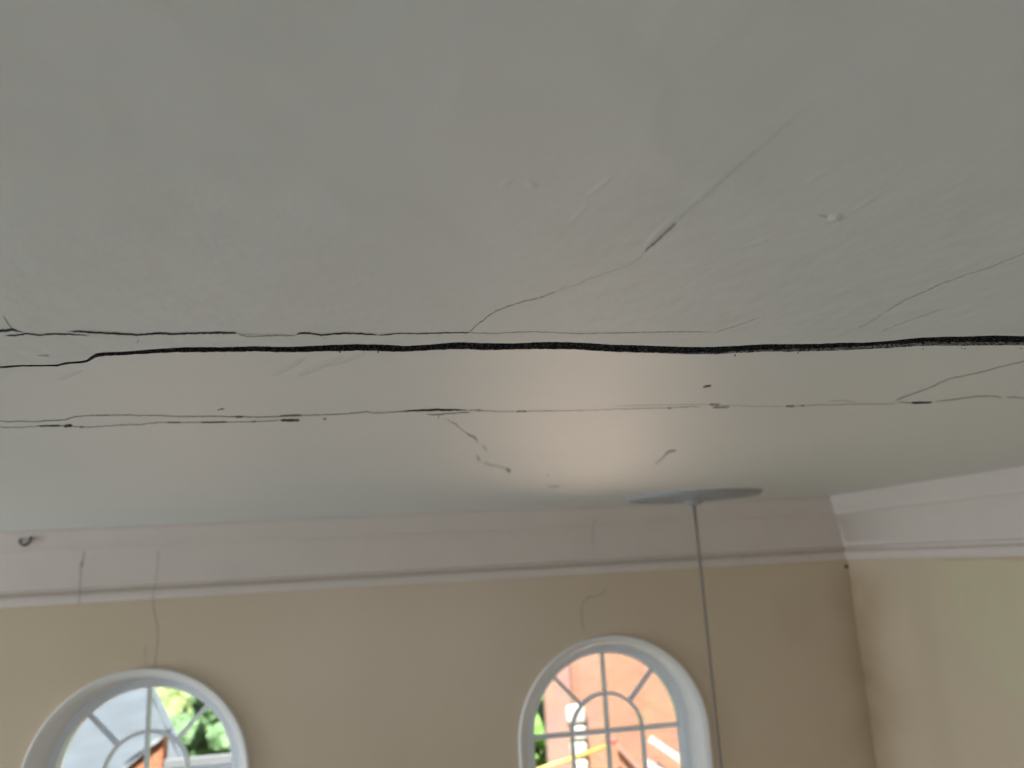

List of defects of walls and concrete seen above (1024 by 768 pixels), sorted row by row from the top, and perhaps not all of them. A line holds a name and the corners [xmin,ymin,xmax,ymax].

crack [0,318,1024,368]
crack [40,409,467,428]